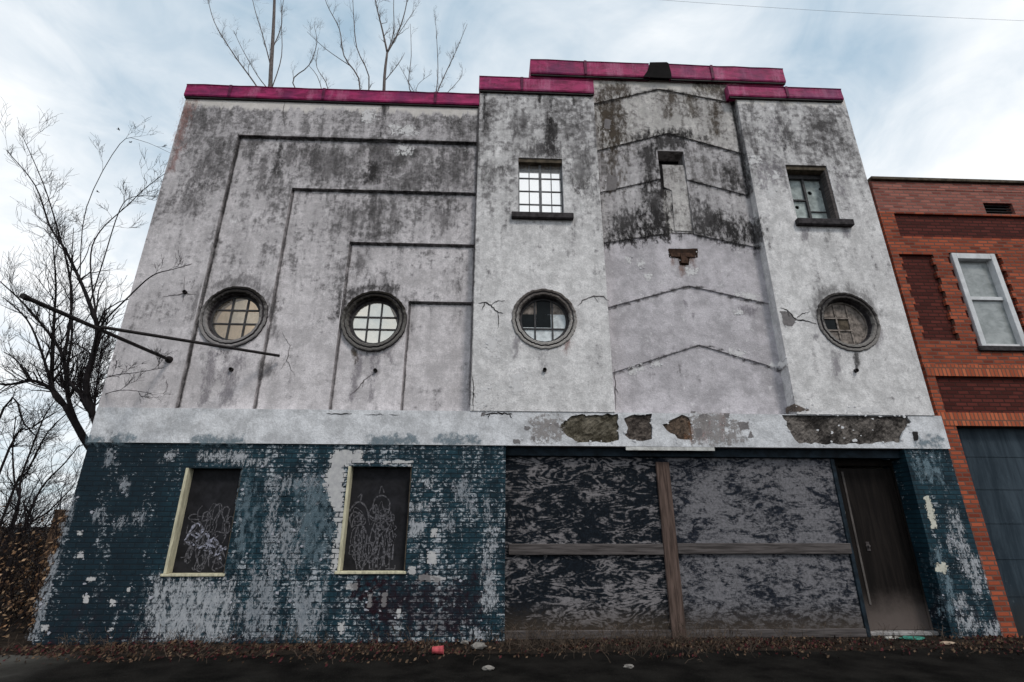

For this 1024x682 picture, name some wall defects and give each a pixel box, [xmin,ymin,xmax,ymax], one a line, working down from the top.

damp [594,80,762,249]
damp [177,93,487,410]
crack [481,300,505,327]
spalling [513,411,754,446]
spalling [782,404,944,484]
peeling [140,448,414,642]
peeling [923,496,1000,637]